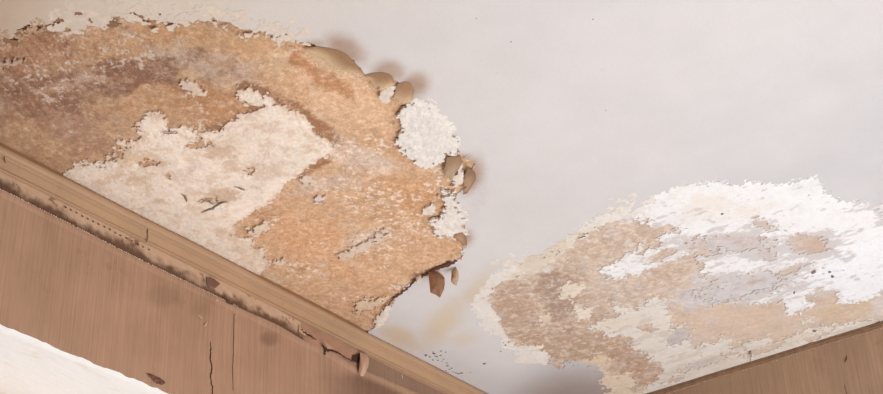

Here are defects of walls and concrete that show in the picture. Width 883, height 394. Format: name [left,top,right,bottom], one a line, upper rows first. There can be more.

leakage [294,15,447,105]
spalling [0,0,475,332]
leakage [122,267,246,342]
peeling [470,174,883,394]
crack [210,320,235,394]